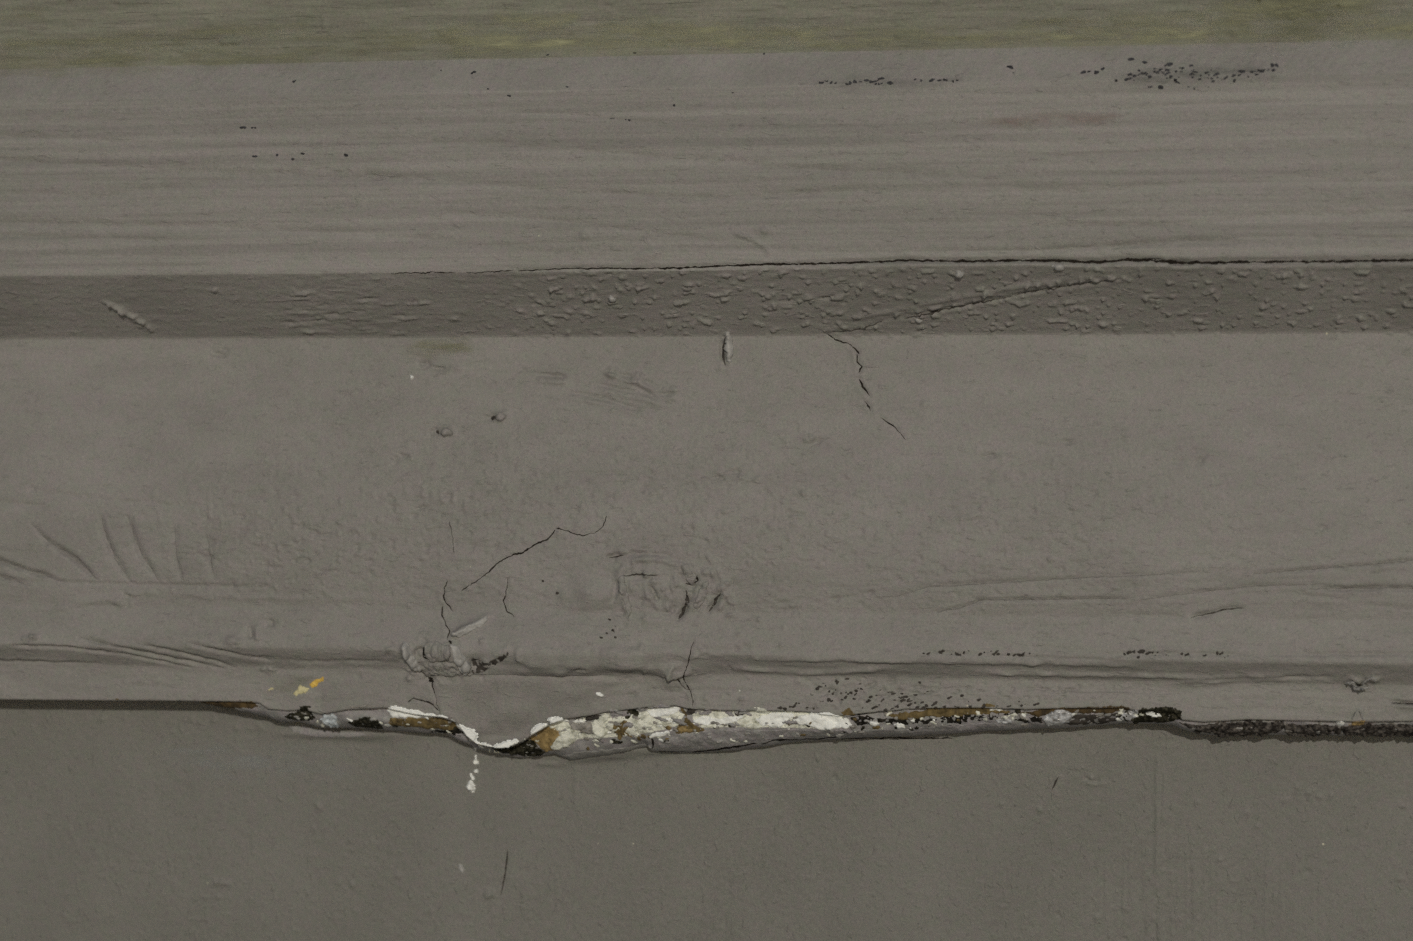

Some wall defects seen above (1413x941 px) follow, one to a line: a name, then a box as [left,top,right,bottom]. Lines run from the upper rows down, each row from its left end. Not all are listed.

crack [396,258,1413,440]
crack [441,518,606,639]
crack [408,671,440,711]
peeling [285,677,1073,758]
peeling [1116,706,1182,724]